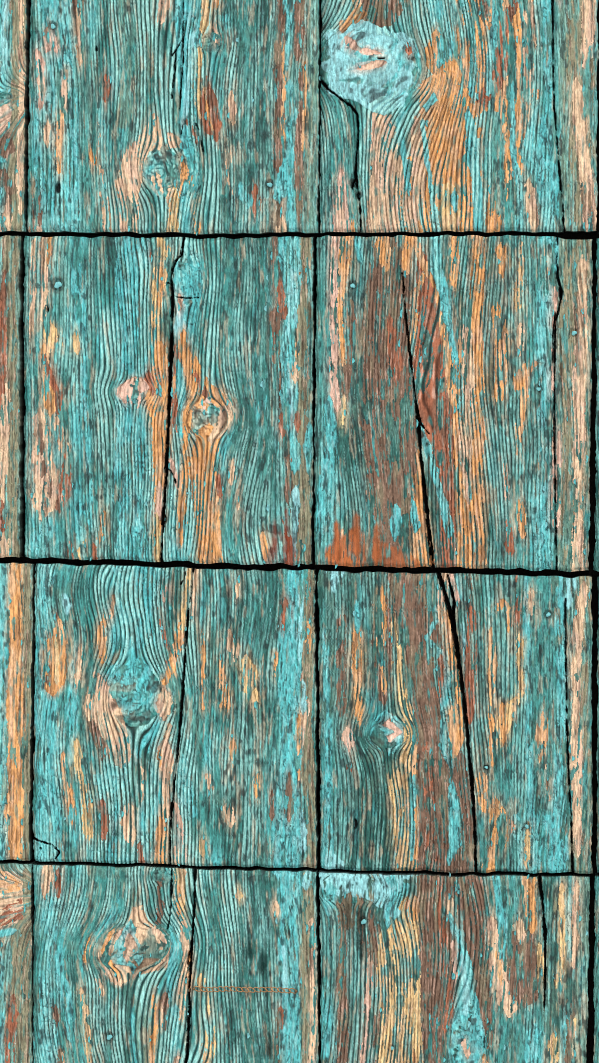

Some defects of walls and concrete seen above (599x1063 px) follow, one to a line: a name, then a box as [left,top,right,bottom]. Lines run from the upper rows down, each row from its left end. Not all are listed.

peeling [0,0,244,1063]
crack [160,237,199,1063]
peeling [217,629,259,712]
crack [322,81,361,235]
crack [401,273,477,875]
peeling [327,0,597,1063]